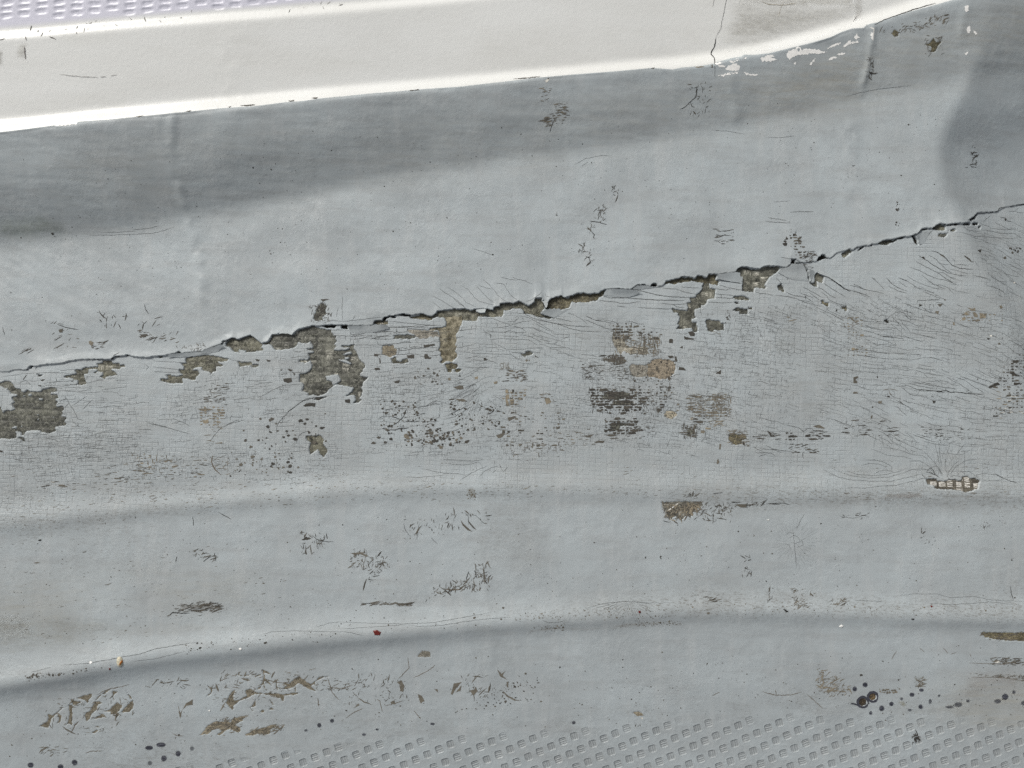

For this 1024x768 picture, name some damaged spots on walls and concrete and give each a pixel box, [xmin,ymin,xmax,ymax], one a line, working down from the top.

peeling [761,3,949,65]
peeling [688,57,758,116]
crack [1,204,1024,491]
peeling [822,298,946,358]
peeling [0,374,66,452]
peeling [41,283,904,489]
peeling [662,492,766,524]
peeling [926,476,979,492]
peeling [41,685,134,735]